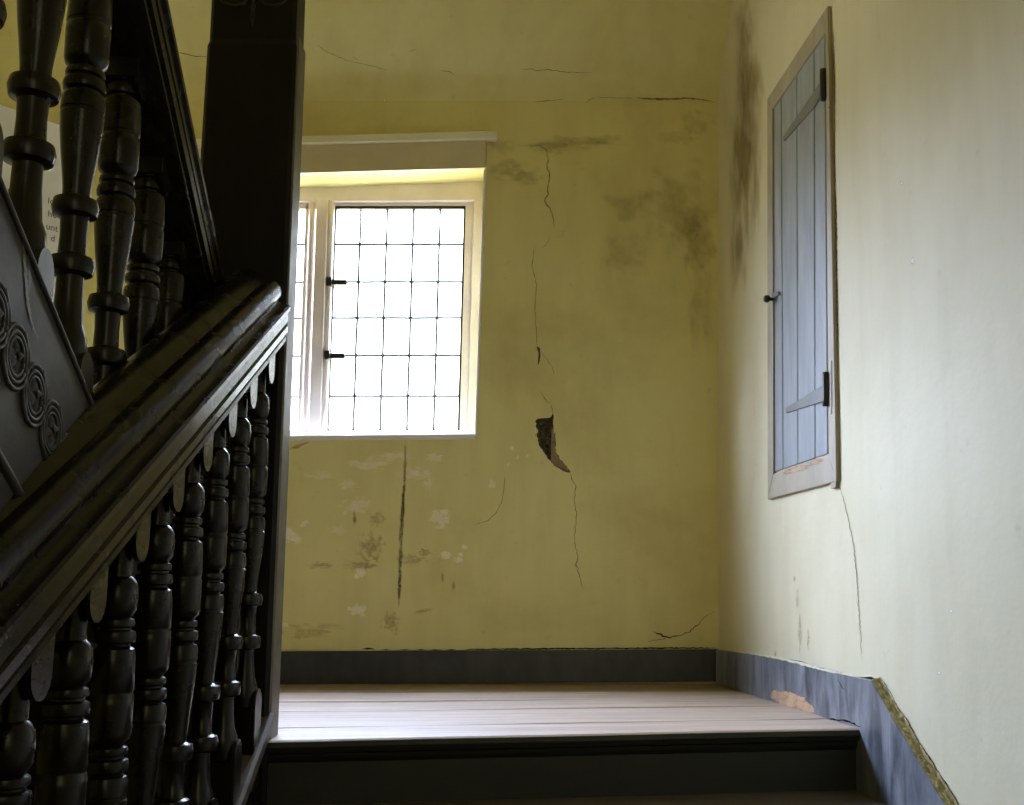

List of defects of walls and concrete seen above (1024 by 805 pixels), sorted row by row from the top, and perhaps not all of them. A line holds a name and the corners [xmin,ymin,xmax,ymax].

crack [641,96,714,104]
crack [532,145,555,412]
spalling [507,414,570,472]
crack [569,472,582,585]
crack [650,614,710,642]
peeling [770,690,815,713]